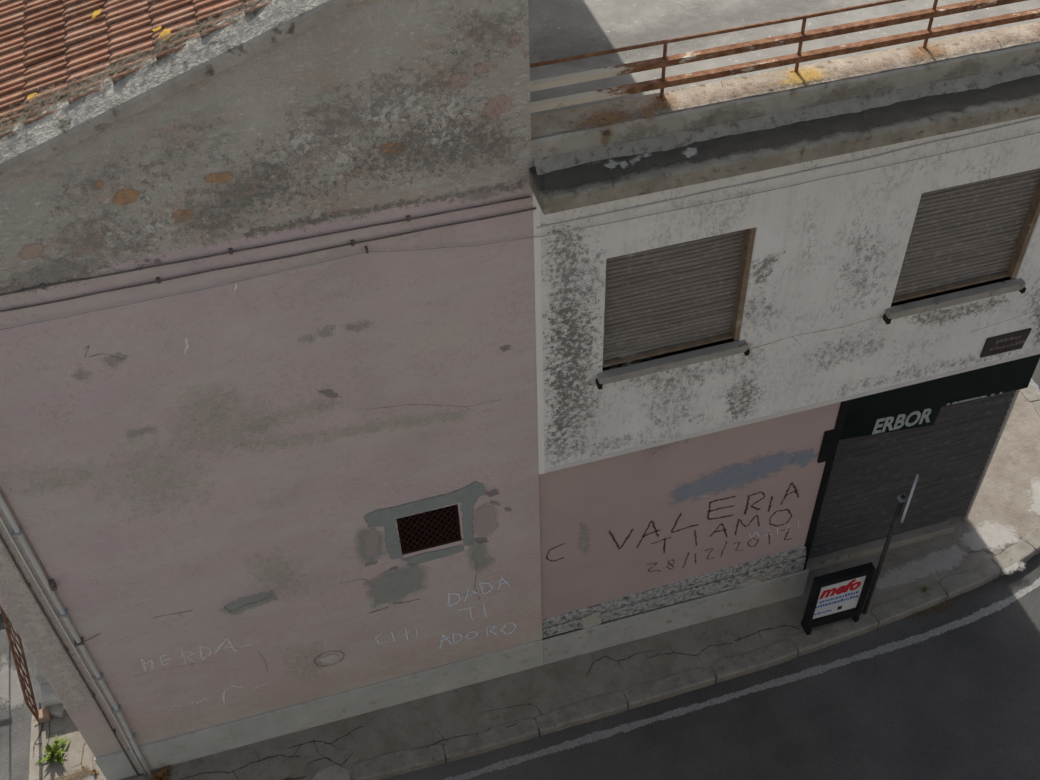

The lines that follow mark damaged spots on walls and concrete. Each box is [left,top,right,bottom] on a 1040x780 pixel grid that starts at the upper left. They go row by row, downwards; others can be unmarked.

corrosion [780,66,823,84]
peeling [365,481,511,571]
crack [181,726,362,780]